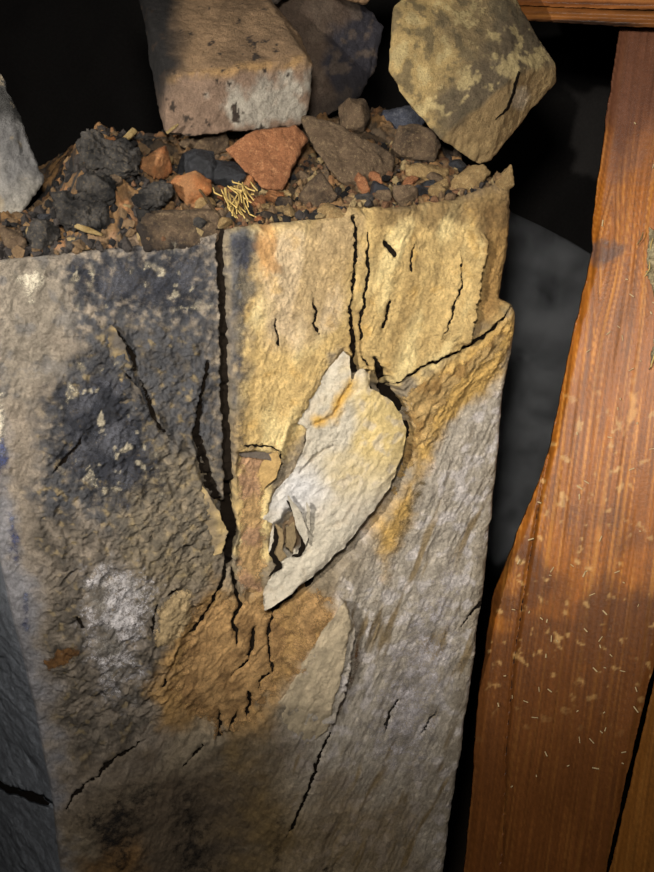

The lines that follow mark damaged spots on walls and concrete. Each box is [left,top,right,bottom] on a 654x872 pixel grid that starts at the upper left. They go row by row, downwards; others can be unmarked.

crack [312,302,320,335]
crack [348,216,512,399]
crack [117,331,166,432]
crack [183,228,282,766]
crack [150,589,178,633]
crack [461,600,482,627]
crack [384,699,399,731]
crack [0,741,140,809]